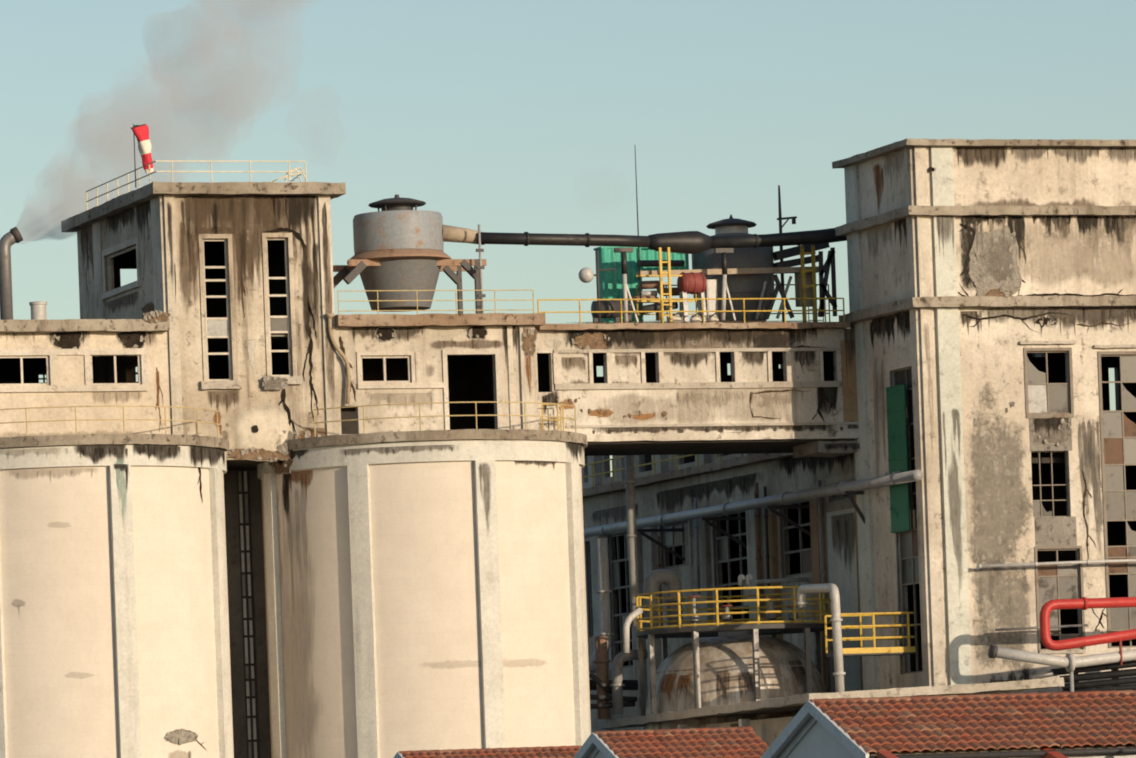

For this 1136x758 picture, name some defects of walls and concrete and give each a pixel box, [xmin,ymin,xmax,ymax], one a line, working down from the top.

rust [874,165,883,206]
water stain [167,195,328,336]
crack [262,224,308,269]
spalling [969,225,1022,297]
water stain [937,215,1136,288]
crack [958,241,1135,332]
spalling [116,301,171,348]
crack [279,298,356,435]
spalling [227,427,327,475]
spalling [164,728,198,745]